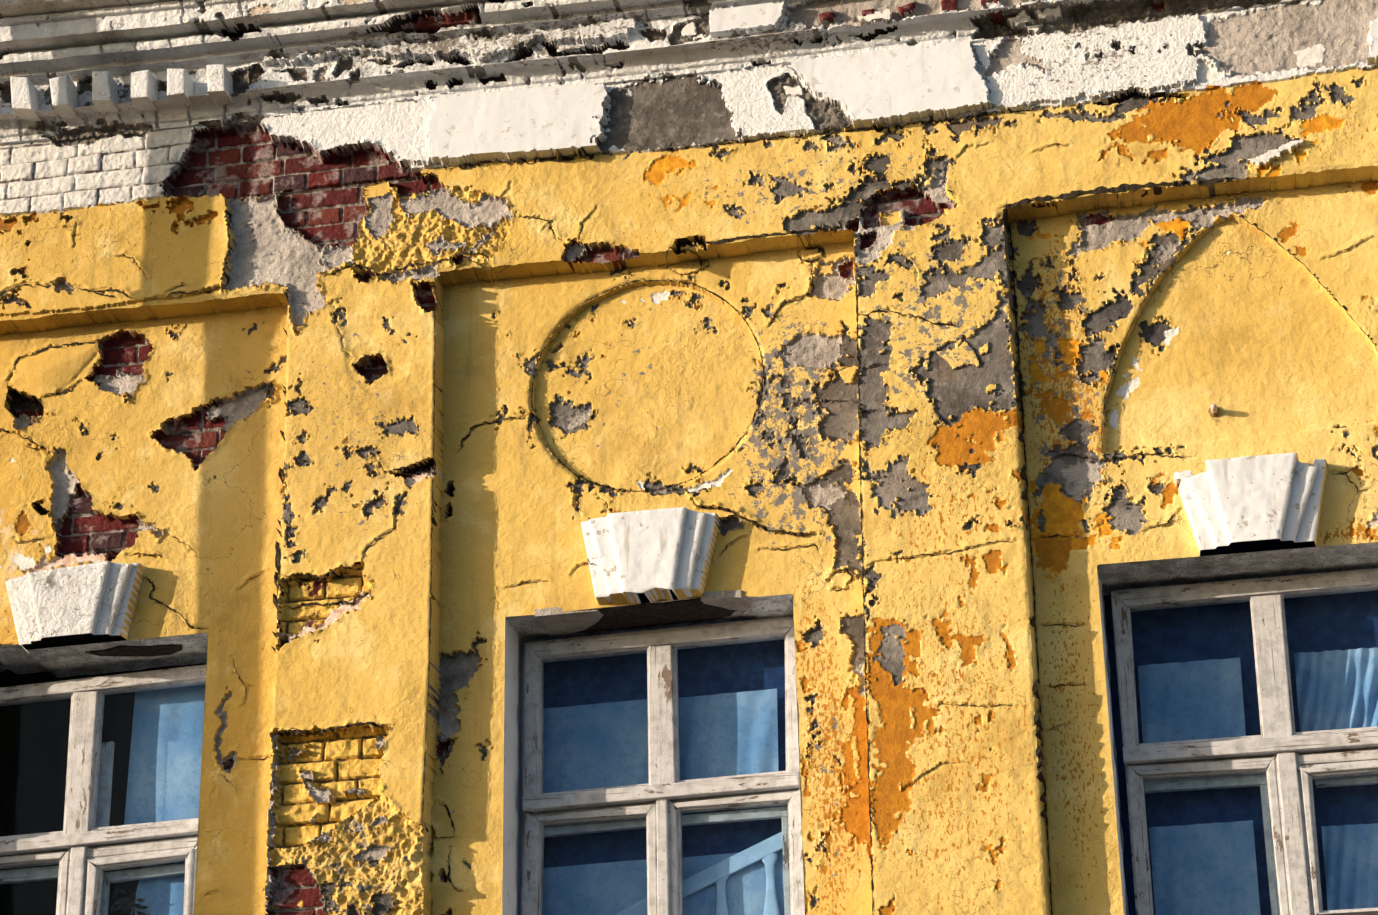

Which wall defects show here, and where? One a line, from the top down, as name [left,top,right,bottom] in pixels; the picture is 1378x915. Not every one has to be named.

crack [0,197,233,303]
spalling [139,56,514,332]
peeling [375,16,746,219]
spalling [15,448,164,572]
spalling [86,328,153,403]
crack [129,531,207,630]
spalling [152,355,314,471]
spalling [276,432,372,650]
peeling [342,416,455,518]
crack [224,175,1378,915]
peeling [745,0,1378,695]
spalling [265,723,452,915]